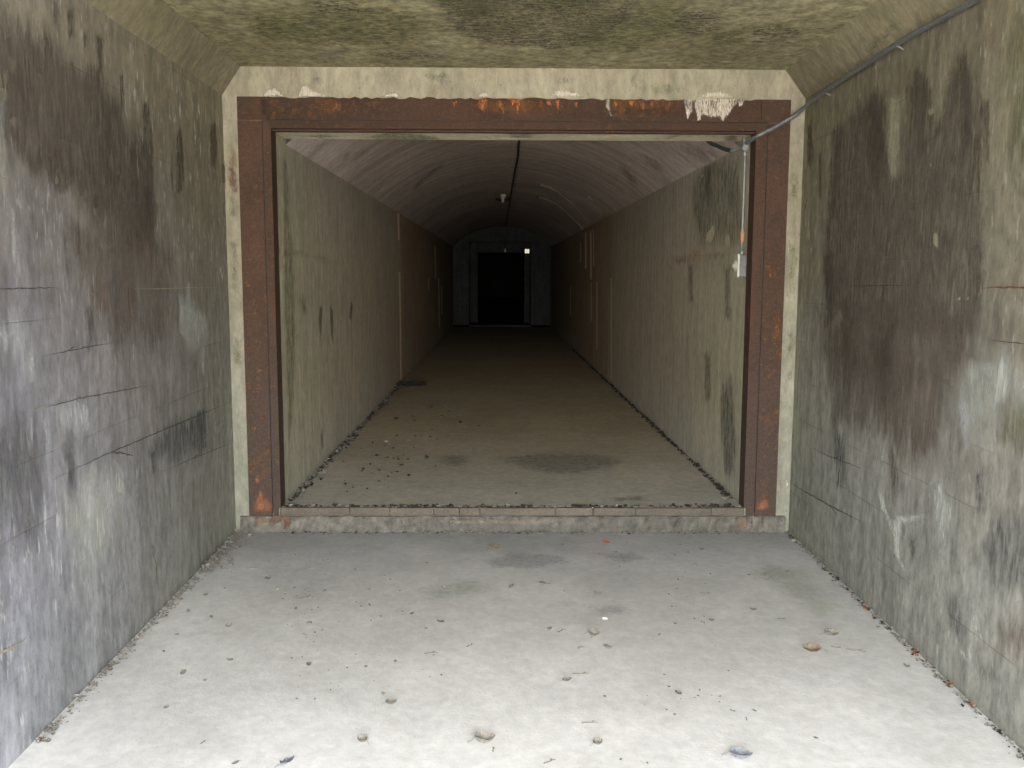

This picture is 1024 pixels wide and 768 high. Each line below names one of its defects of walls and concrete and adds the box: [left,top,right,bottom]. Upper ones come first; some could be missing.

leakage [298,86,325,97]
leakage [686,91,743,121]
leakage [0,19,168,346]
crack [0,284,55,292]
leakage [807,58,1007,568]
crack [45,342,113,356]
crack [35,385,152,410]
crack [58,403,227,477]
leakage [988,521,1022,586]